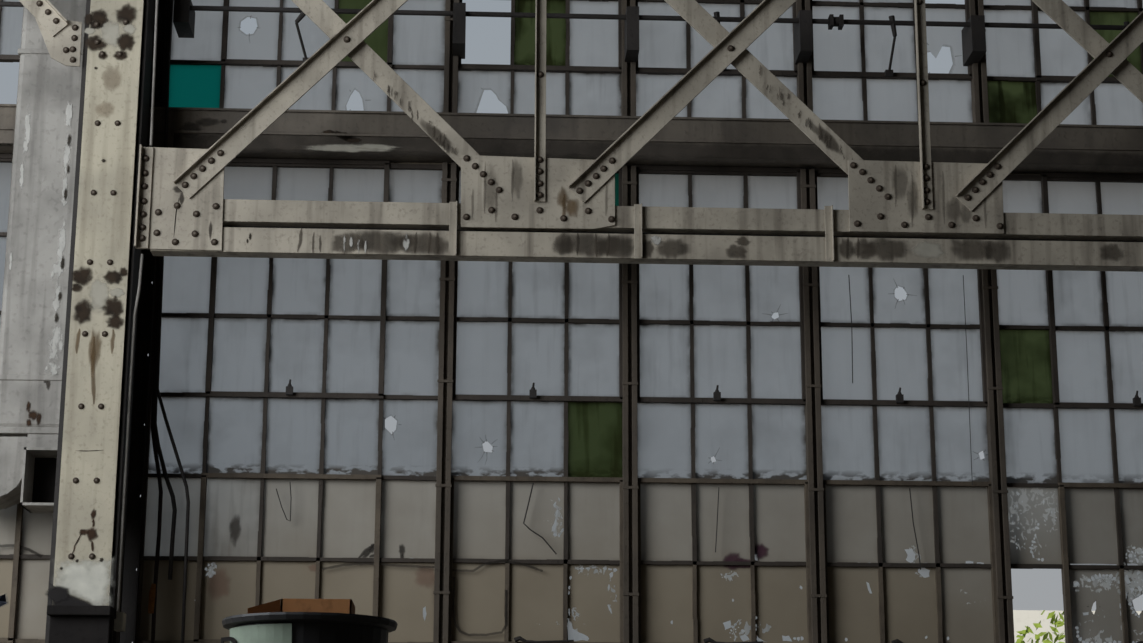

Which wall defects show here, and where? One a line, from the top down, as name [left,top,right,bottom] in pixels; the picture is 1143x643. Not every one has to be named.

leakage [555,233,686,257]
rust [72,510,98,553]
peeling [56,558,110,606]